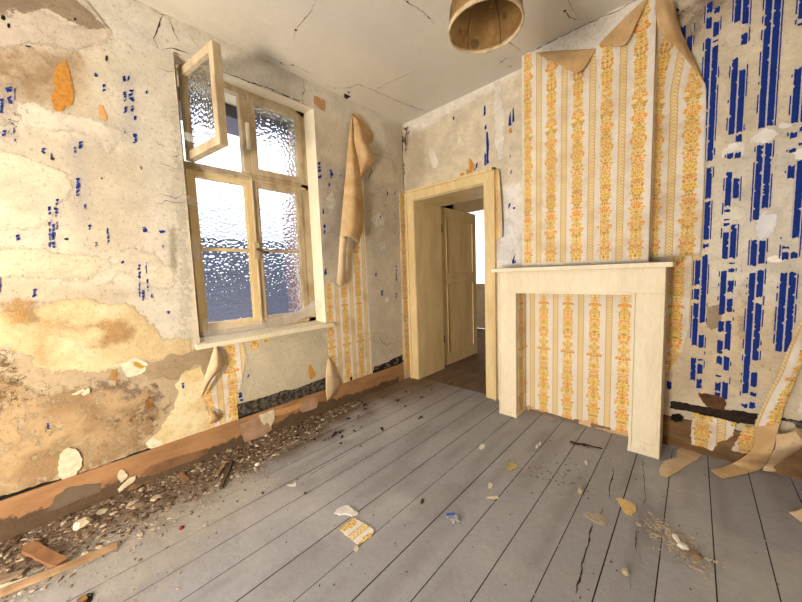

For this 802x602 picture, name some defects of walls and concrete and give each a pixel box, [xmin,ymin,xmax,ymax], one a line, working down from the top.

peeling [0,0,114,61]
crack [134,0,193,72]
flaking render [706,305,722,330]
damp [0,294,171,496]
peeling [115,348,214,449]
flaking render [698,393,727,411]
peeling [117,448,208,492]